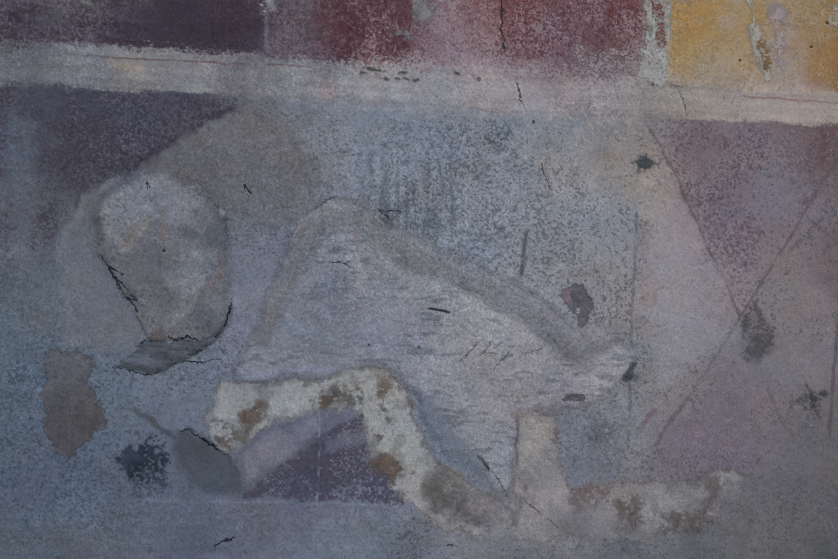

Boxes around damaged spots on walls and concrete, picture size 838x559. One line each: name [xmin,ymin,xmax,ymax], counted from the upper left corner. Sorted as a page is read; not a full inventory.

peeling [412,0,443,25]
crack [499,0,521,101]
peeling [746,0,795,81]
crack [102,256,138,312]
crack [112,303,232,375]
spalling [561,283,594,327]
spalling [41,348,108,458]
water stain [116,408,174,489]
spalling [176,364,746,543]